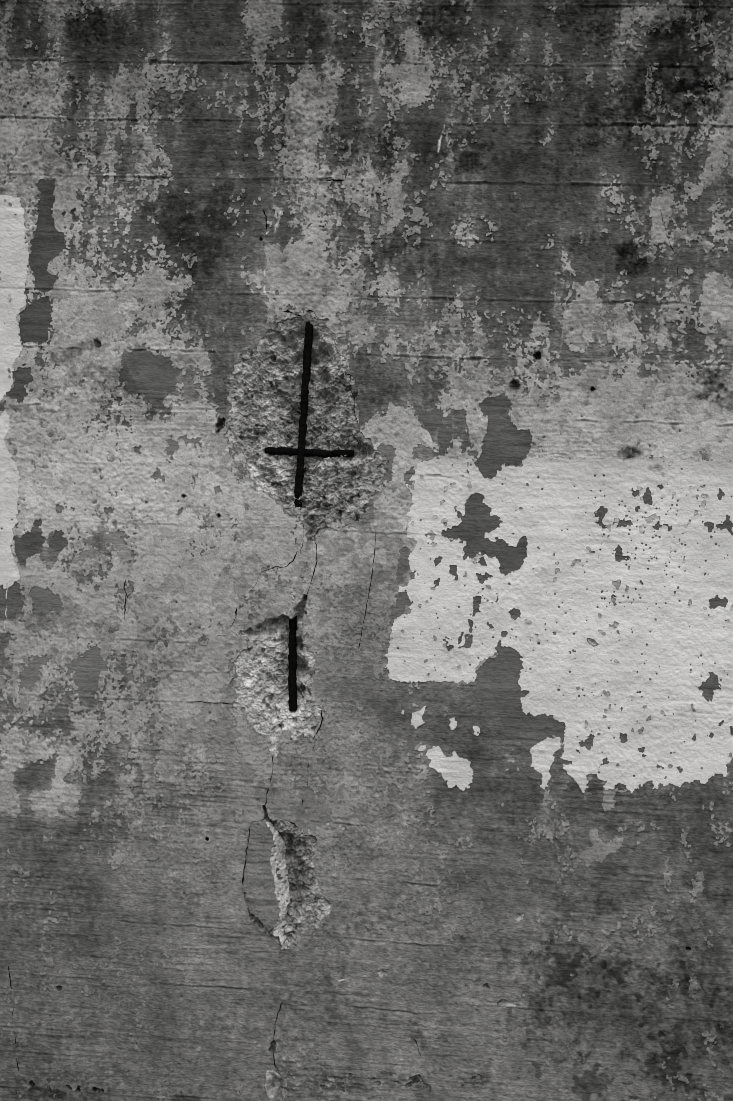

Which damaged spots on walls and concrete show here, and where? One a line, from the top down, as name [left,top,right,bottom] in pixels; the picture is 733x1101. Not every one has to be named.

peeling [38,0,135,26]
peeling [533,32,564,102]
peeling [600,0,733,264]
peeling [212,169,261,238]
peeling [449,214,499,248]
peeling [401,703,426,729]
peeling [557,821,660,886]
peeling [679,829,705,903]
peeling [702,801,732,847]
peeling [526,850,676,986]
peeling [666,952,705,1009]
peeling [662,1018,728,1101]